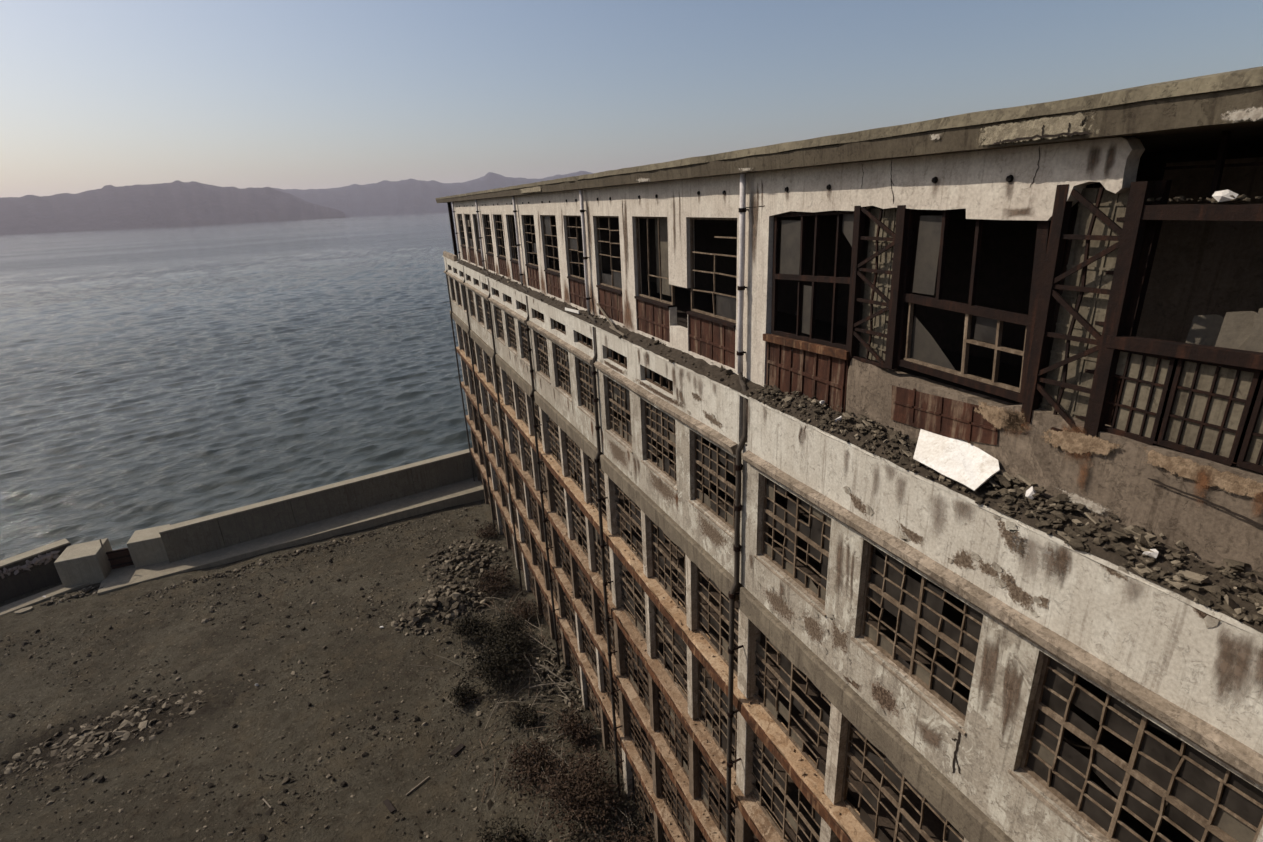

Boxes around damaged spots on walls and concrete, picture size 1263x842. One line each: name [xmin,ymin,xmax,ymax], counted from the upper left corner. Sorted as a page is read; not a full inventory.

spalling [976,112,1098,146]
peeling [1222,107,1263,121]
spalling [974,400,1025,433]
spalling [1042,429,1121,455]
spalling [1144,447,1263,498]
leakage [444,270,1263,787]